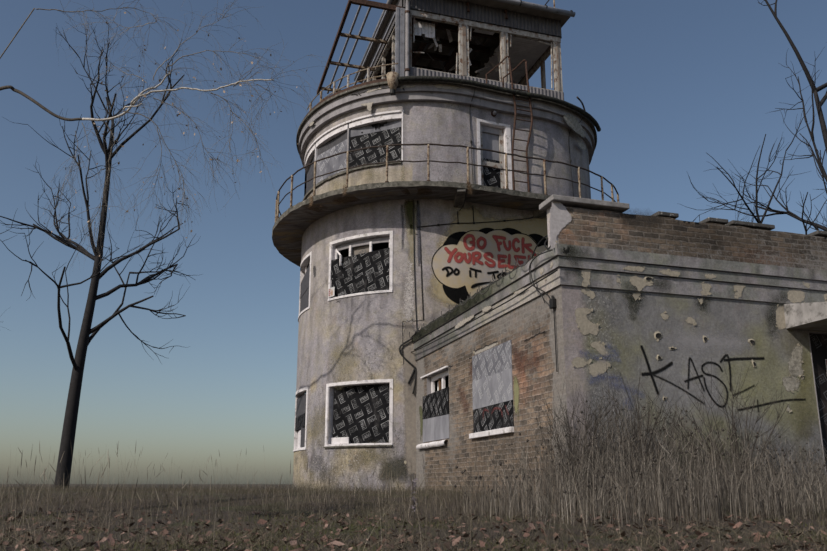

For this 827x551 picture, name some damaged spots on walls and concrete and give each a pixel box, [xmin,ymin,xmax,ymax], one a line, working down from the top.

water stain [401,201,421,270]
flaking render [549,202,573,249]
peeling [571,269,610,377]
peeling [616,266,680,301]
peeling [698,274,716,304]
peeling [775,281,810,330]
flaking render [782,343,805,393]